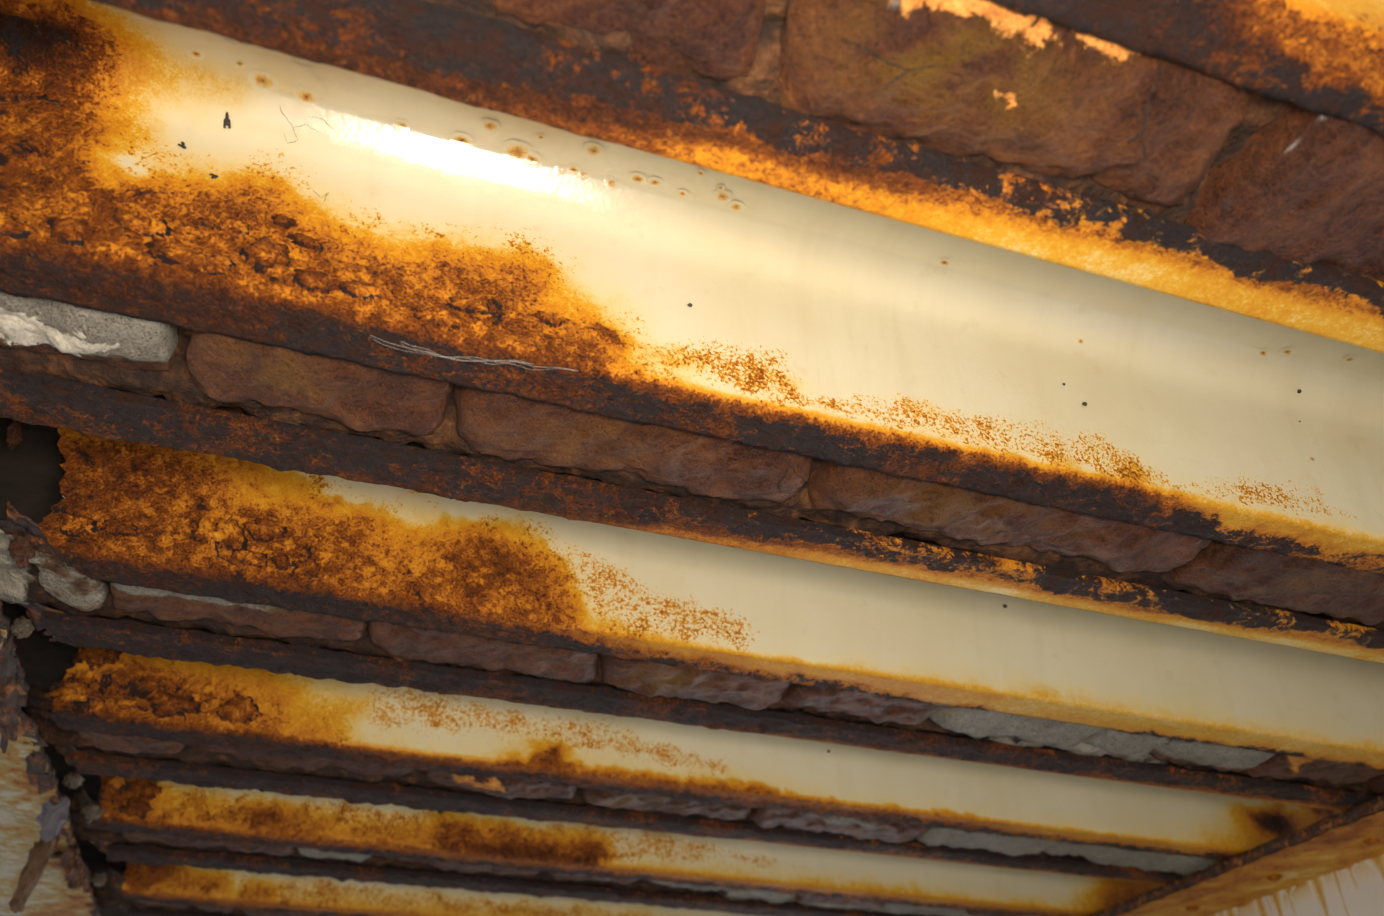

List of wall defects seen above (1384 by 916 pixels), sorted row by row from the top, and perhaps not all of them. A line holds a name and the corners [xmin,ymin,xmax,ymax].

corrosion [0,0,1384,576]
corrosion [0,368,1384,770]
corrosion [0,611,1384,916]